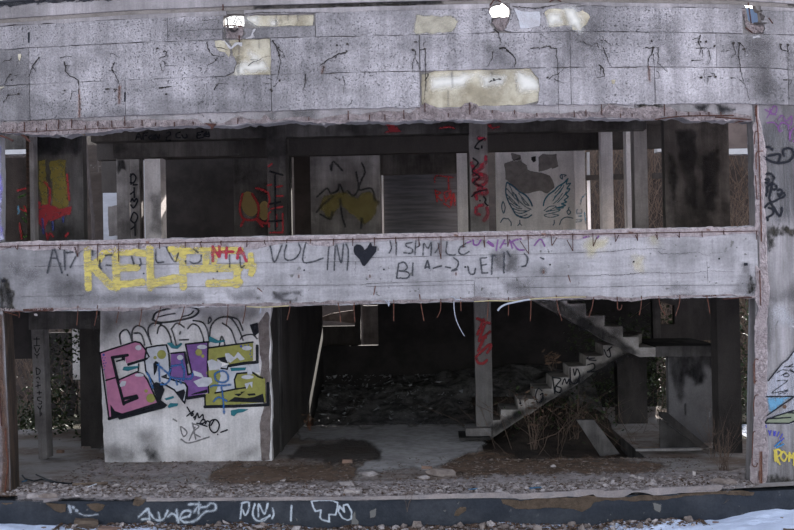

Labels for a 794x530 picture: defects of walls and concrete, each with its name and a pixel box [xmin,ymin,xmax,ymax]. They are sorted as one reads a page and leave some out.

crack [2,57,40,125]
crack [60,56,80,117]
crack [105,53,120,103]
peeling [215,15,314,75]
crack [303,43,352,106]
crack [485,29,563,109]
peeling [484,0,590,31]
crack [645,40,665,92]
crack [691,35,750,101]
spalling [742,2,773,38]
spalling [0,68,770,505]
spalling [501,490,755,512]